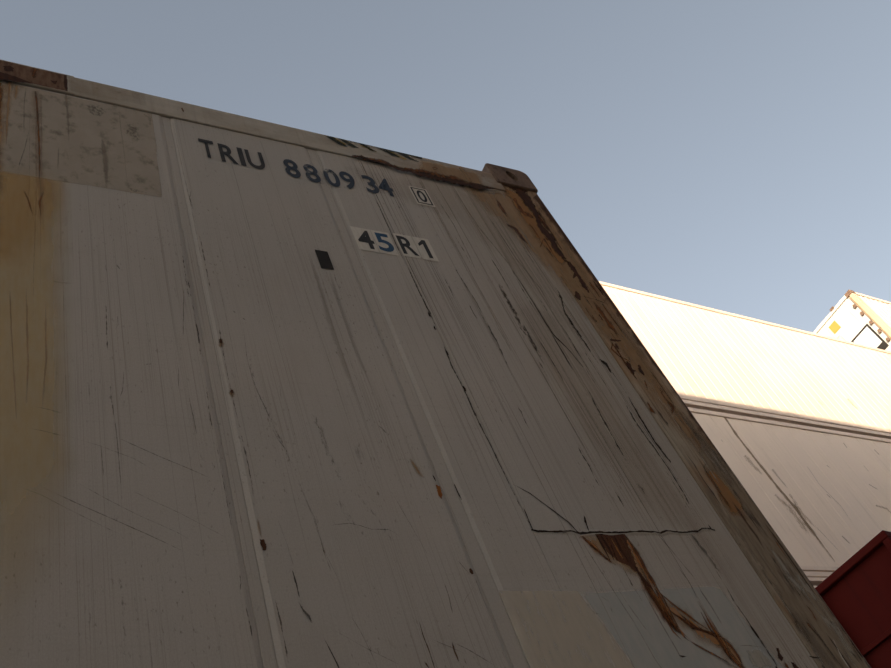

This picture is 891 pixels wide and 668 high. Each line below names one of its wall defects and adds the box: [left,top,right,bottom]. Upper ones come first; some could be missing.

rust [0,60,68,178]
crack [377,203,777,668]
rust [352,155,870,668]
peeling [658,399,858,668]